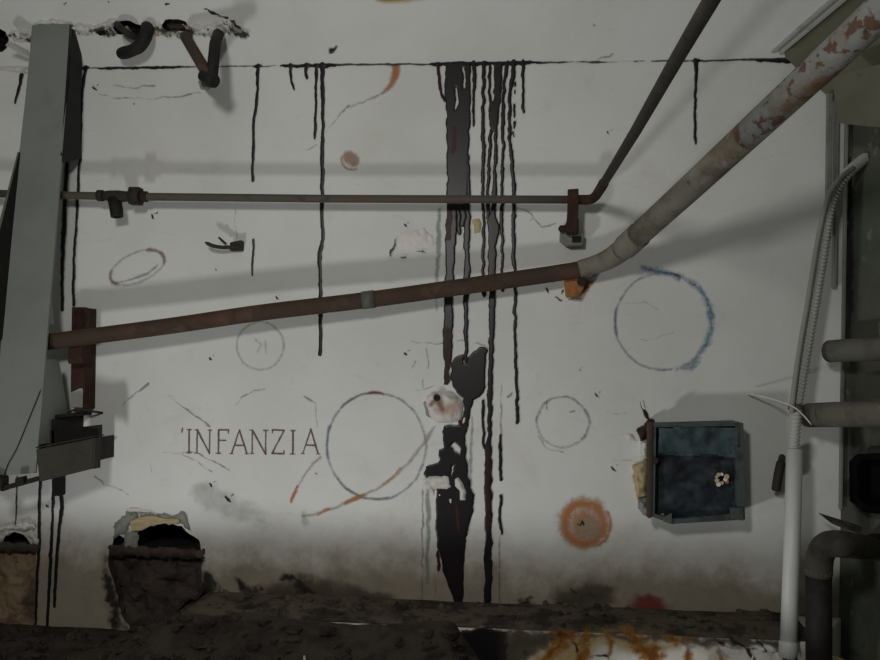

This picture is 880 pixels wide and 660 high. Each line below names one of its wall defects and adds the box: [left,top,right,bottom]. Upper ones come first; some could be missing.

spalling [37,19,140,37]
spalling [153,8,249,39]
crack [89,64,196,72]
crack [219,60,606,68]
crack [634,57,791,65]
leakage [251,63,260,182]
leakage [304,62,325,297]
leakage [436,59,525,281]
flaking render [423,391,465,423]
leakage [424,288,519,603]
flaking render [103,507,217,630]
corrosion [514,626,779,660]